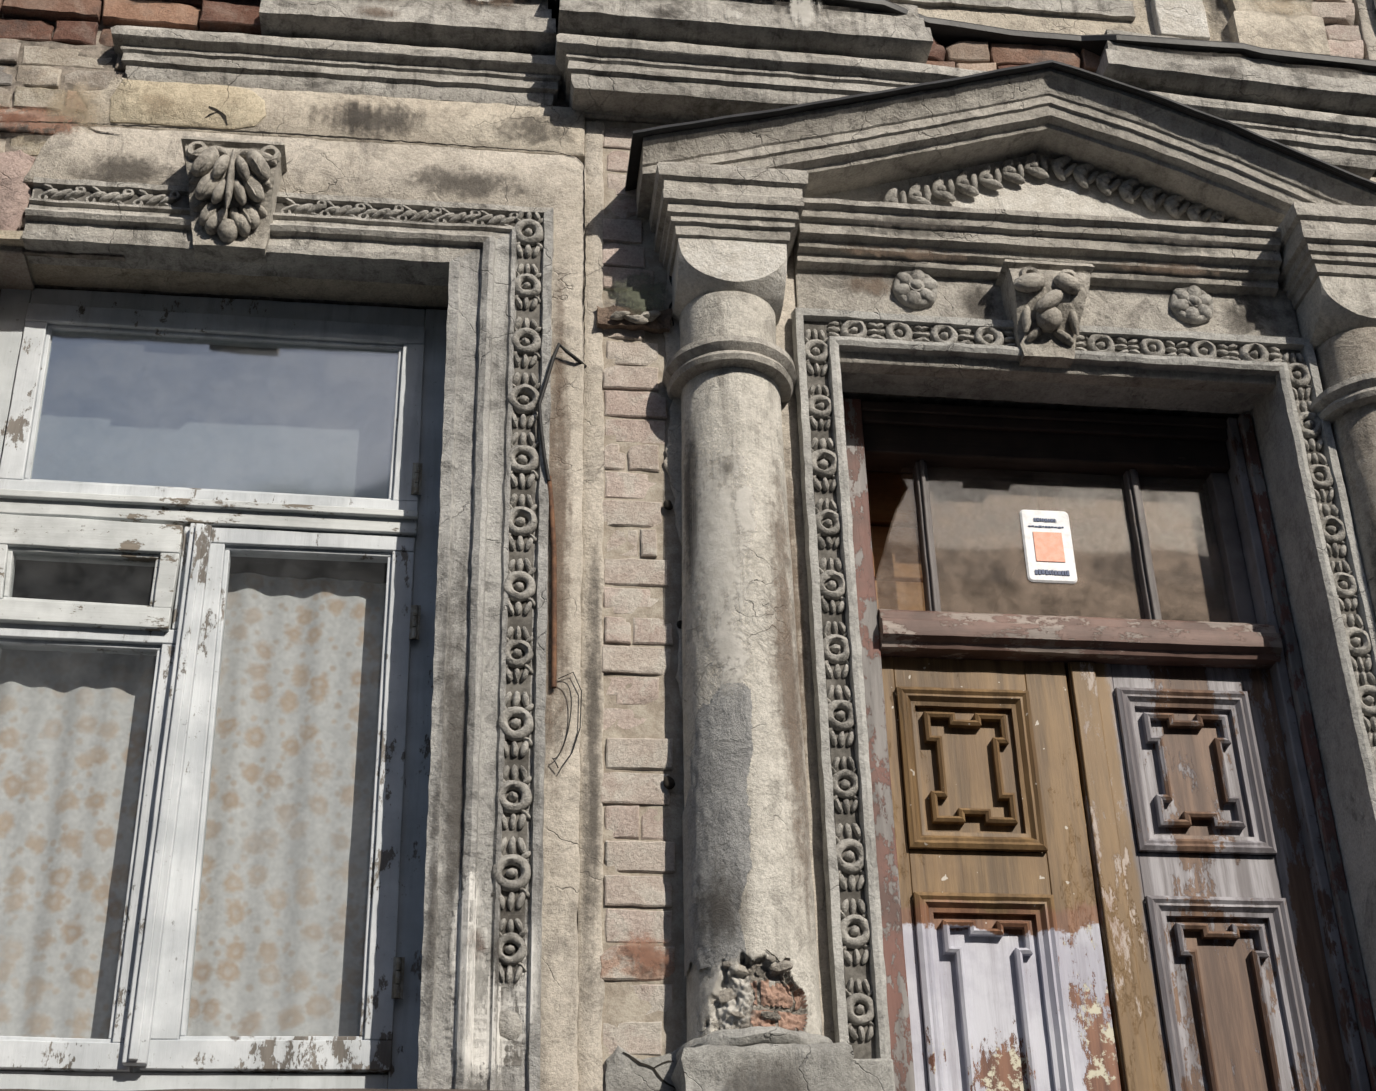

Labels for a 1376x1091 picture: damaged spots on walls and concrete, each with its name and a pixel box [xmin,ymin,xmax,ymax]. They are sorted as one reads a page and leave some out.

leakage [333,103,409,133]
spalling [705,955,808,1031]
crack [622,1052,676,1090]